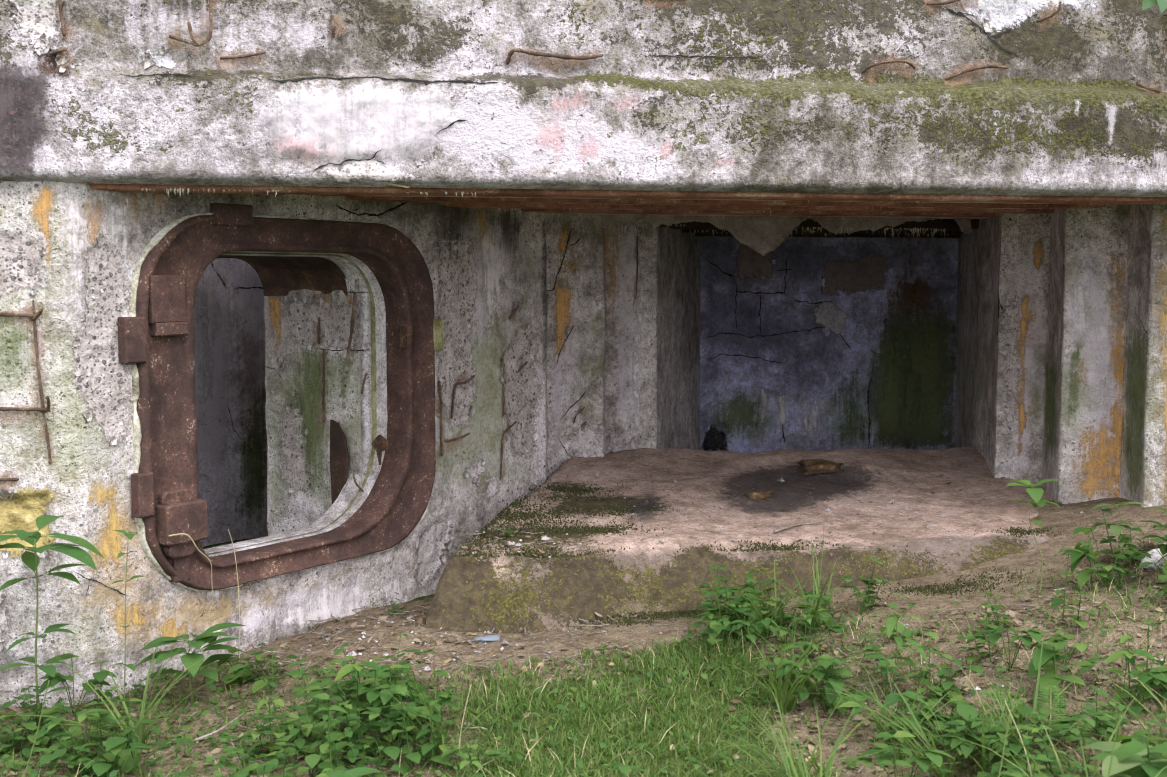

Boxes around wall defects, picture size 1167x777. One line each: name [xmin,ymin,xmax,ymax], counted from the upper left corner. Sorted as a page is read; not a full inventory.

crack [120,71,197,79]
crack [268,76,499,84]
peeling [602,215,972,256]
crack [706,258,851,363]
damp [802,318,955,449]
damp [716,388,786,437]
damp [717,462,881,516]